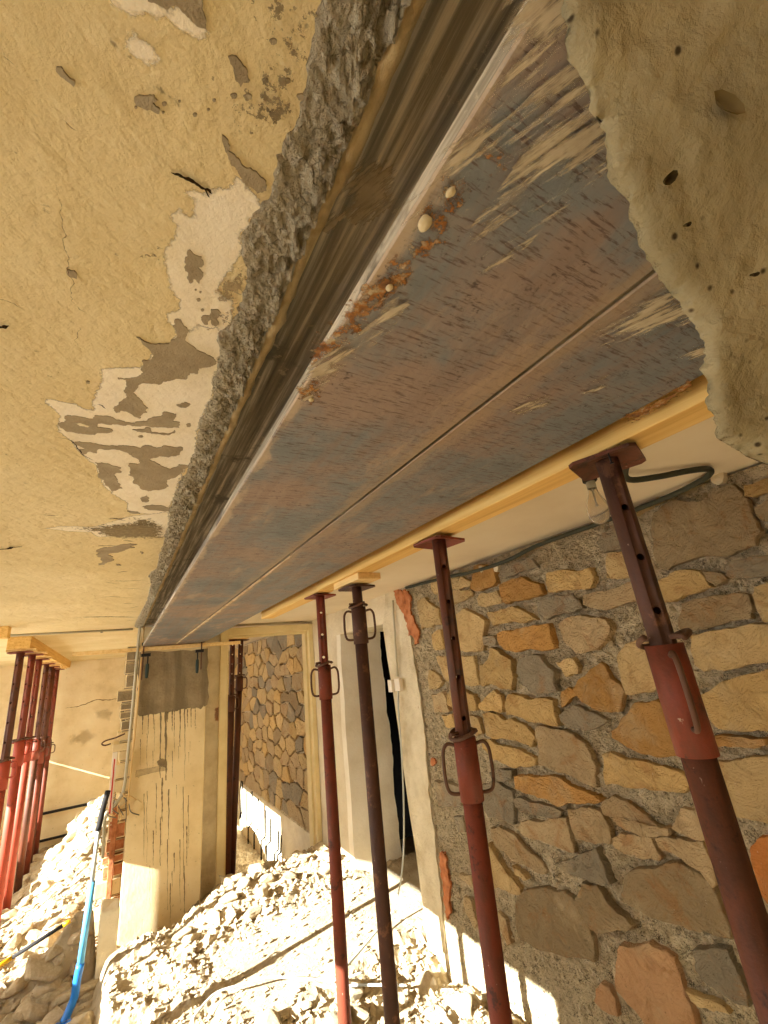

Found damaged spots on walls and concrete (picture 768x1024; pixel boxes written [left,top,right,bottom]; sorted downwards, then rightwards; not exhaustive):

peeling [111,0,207,39]
peeling [127,34,160,64]
peeling [134,94,181,114]
crack [171,172,212,197]
rust [309,176,472,367]
peeling [45,134,267,566]
leakage [140,708,196,913]